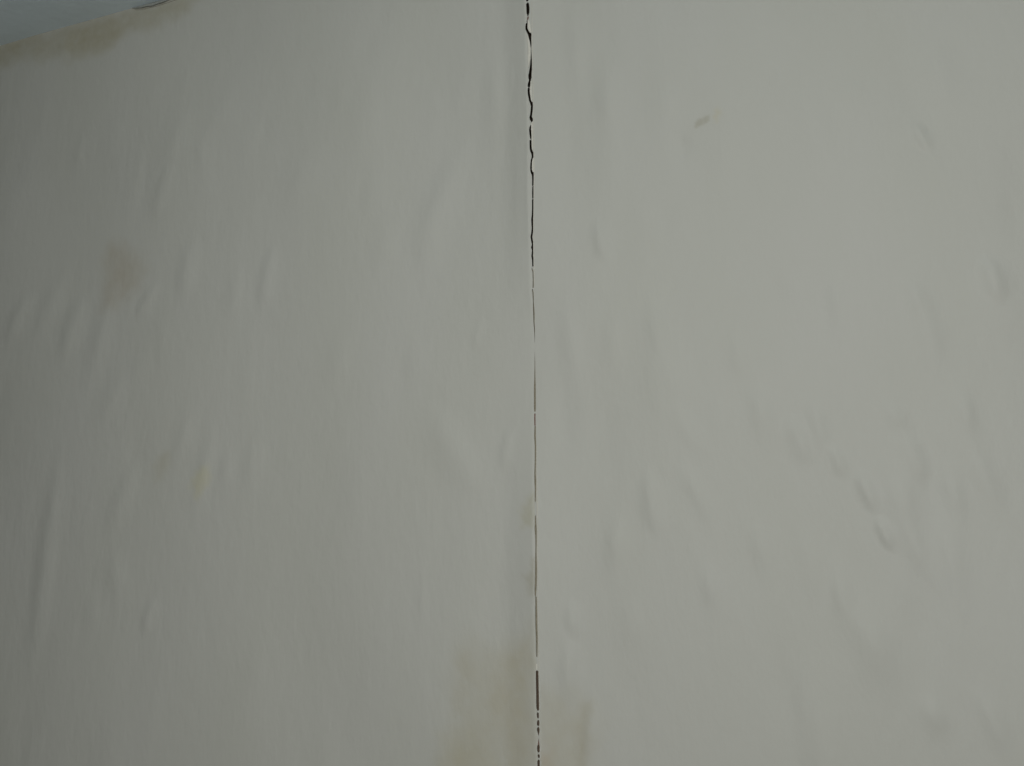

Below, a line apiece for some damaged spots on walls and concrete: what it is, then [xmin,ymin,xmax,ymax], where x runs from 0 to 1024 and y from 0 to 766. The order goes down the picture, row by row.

crack [525,0,535,337]
crack [533,371,541,766]